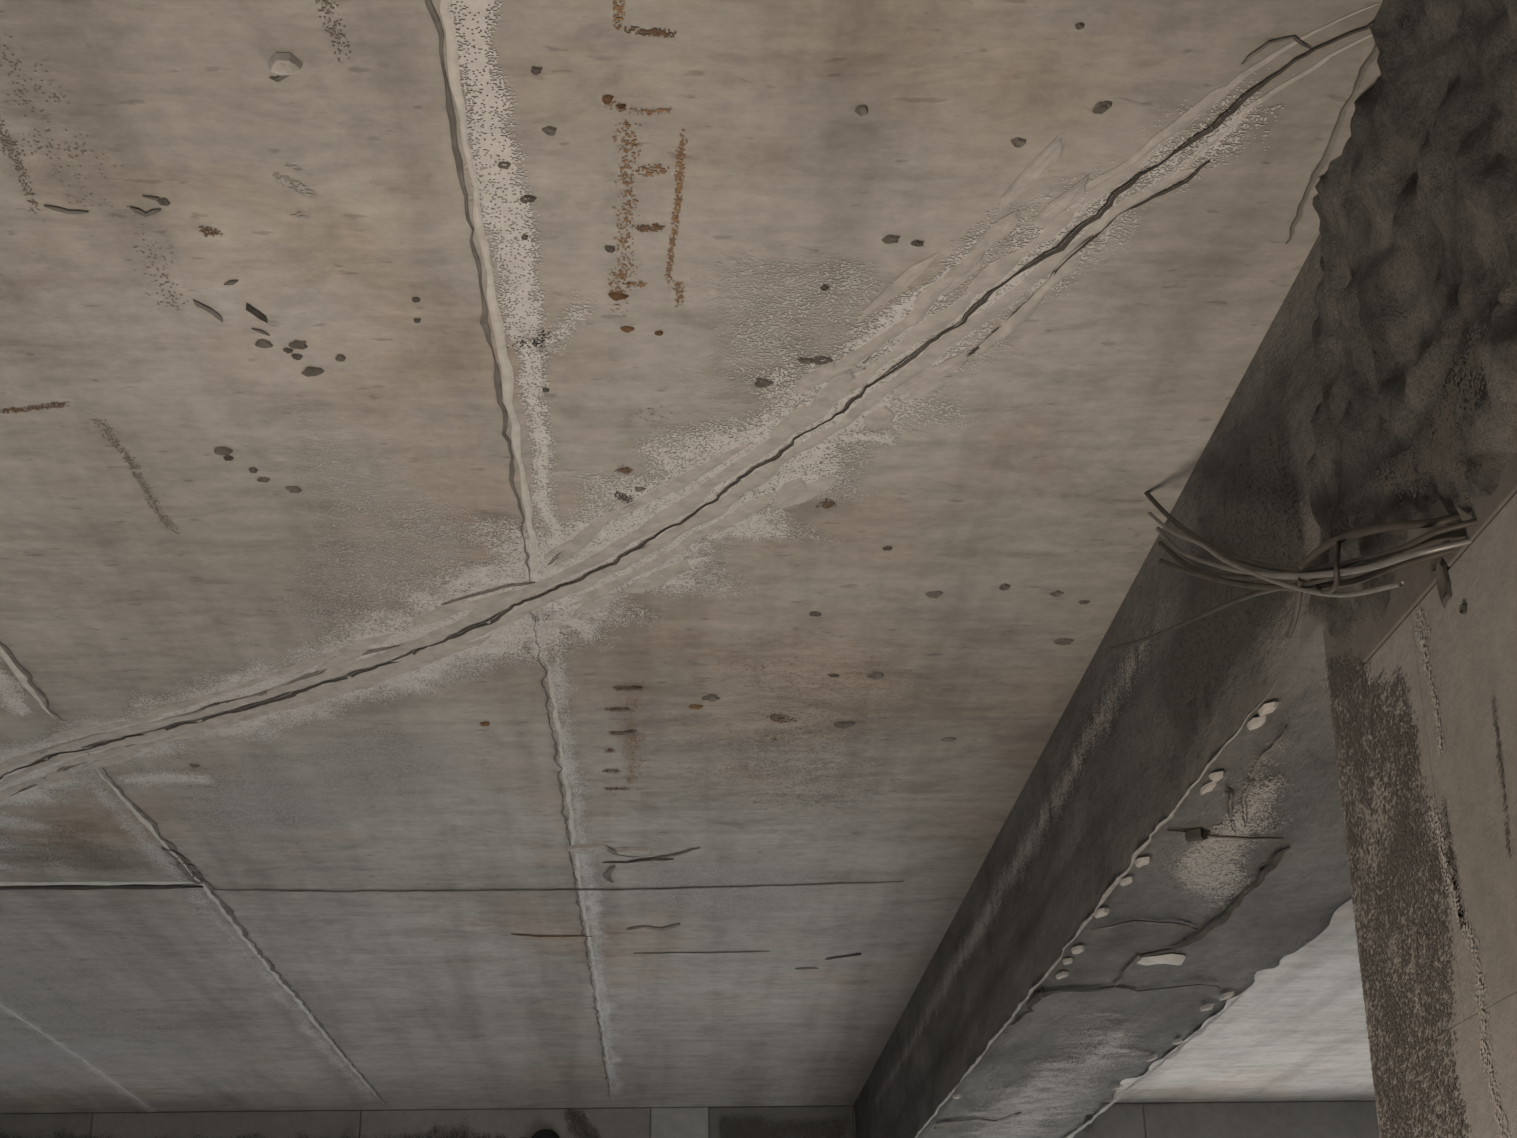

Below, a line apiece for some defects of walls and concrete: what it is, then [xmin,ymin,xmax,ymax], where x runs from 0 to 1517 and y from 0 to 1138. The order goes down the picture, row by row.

corrosion [613,0,676,38]
water stain [0,34,189,310]
corrosion [605,102,687,313]
water stain [1041,193,1156,303]
crack [0,3,1379,803]
water stain [0,656,36,717]
crack [162,847,204,884]
water stain [573,853,626,1098]
water stain [634,858,830,923]
spalling [915,678,1279,1138]
crack [1011,727,1291,1025]